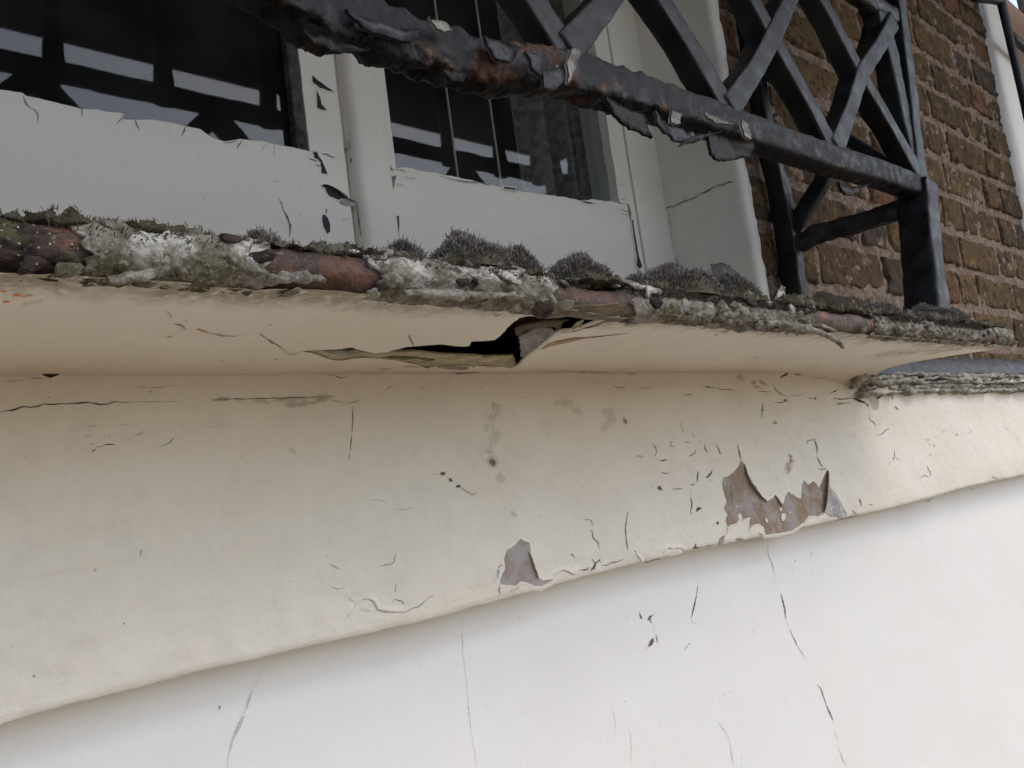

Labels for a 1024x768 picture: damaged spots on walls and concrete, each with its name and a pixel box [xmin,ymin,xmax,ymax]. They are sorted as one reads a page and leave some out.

peeling [310,74,336,112]
peeling [310,150,361,236]
crack [667,181,733,231]
spalling [302,279,621,370]
crack [1,382,197,412]
crack [760,386,901,465]
peeling [693,447,858,549]
peeling [495,535,555,592]
crack [768,550,812,662]